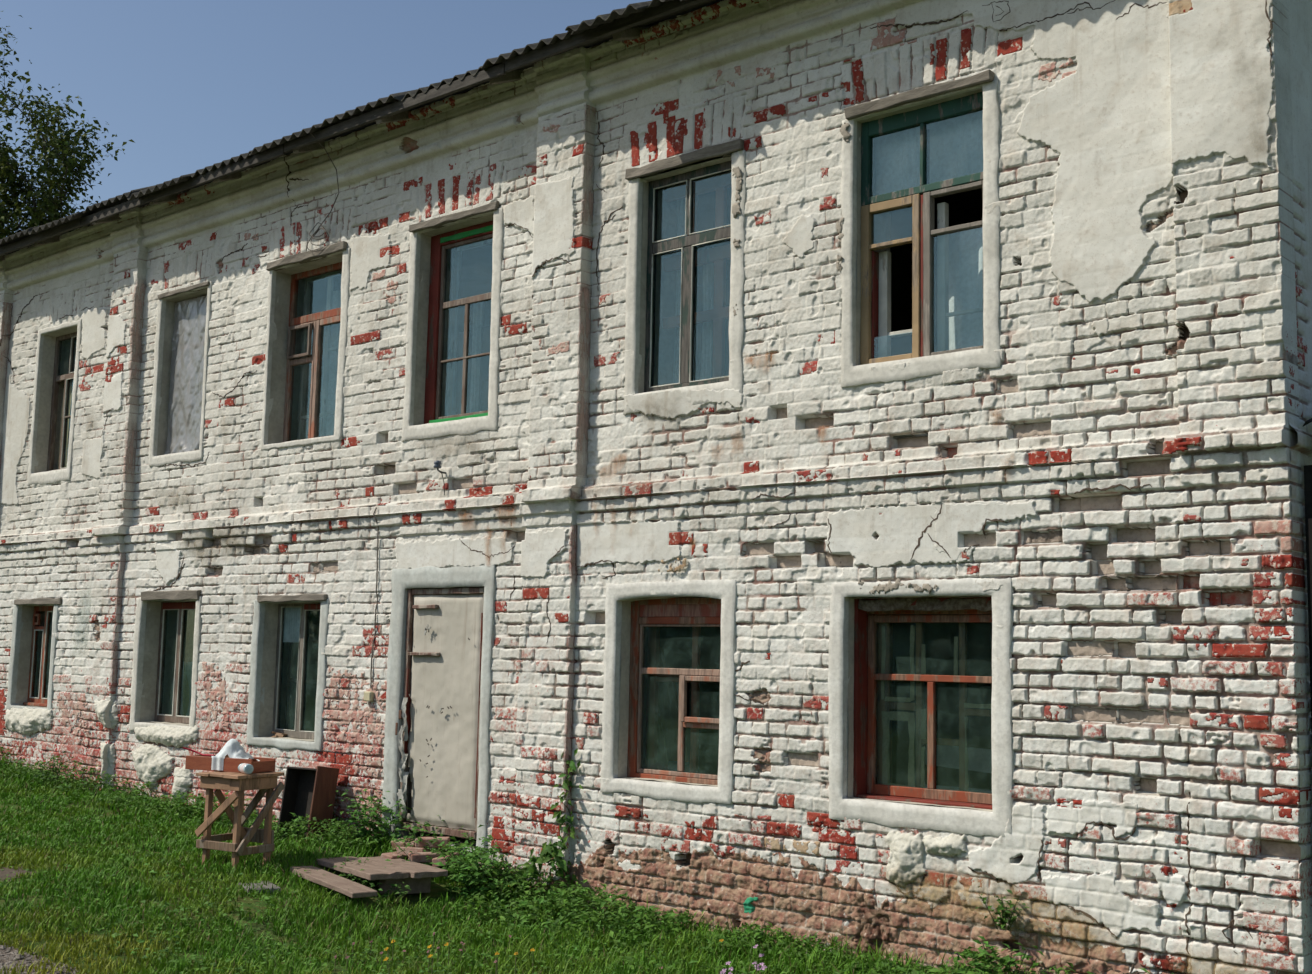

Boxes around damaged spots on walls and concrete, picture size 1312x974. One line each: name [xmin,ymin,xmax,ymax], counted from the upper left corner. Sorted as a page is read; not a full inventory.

crack [870,0,1166,31]
peeling [630,99,708,167]
crack [508,122,623,299]
spalling [1122,436,1202,476]
peeling [743,499,1063,595]
crack [910,504,1012,561]
spalling [1050,490,1123,512]
peeling [316,625,389,833]
spalling [1044,705,1291,768]
spalling [488,748,1188,974]
crack [1080,821,1136,841]
spalling [1260,839,1307,907]